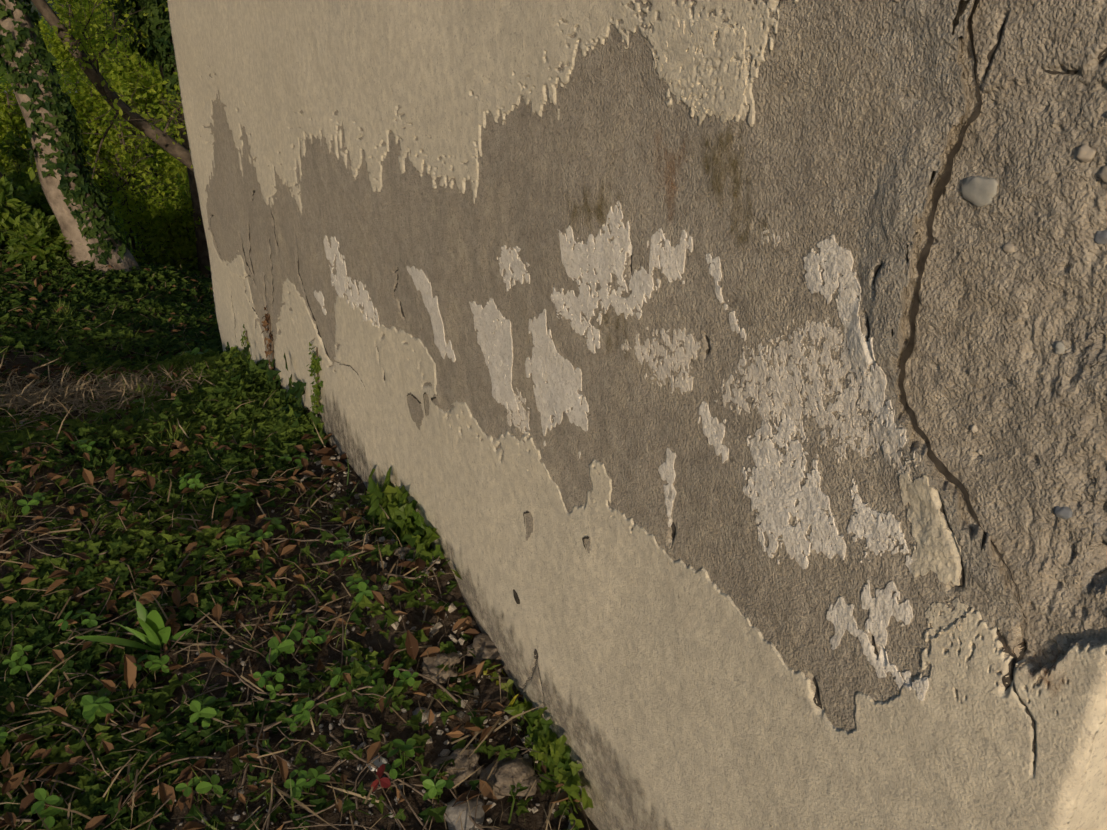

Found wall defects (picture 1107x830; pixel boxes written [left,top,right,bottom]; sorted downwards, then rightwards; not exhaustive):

peeling [200,0,1107,732]
crack [865,263,882,342]
crack [899,0,1036,774]